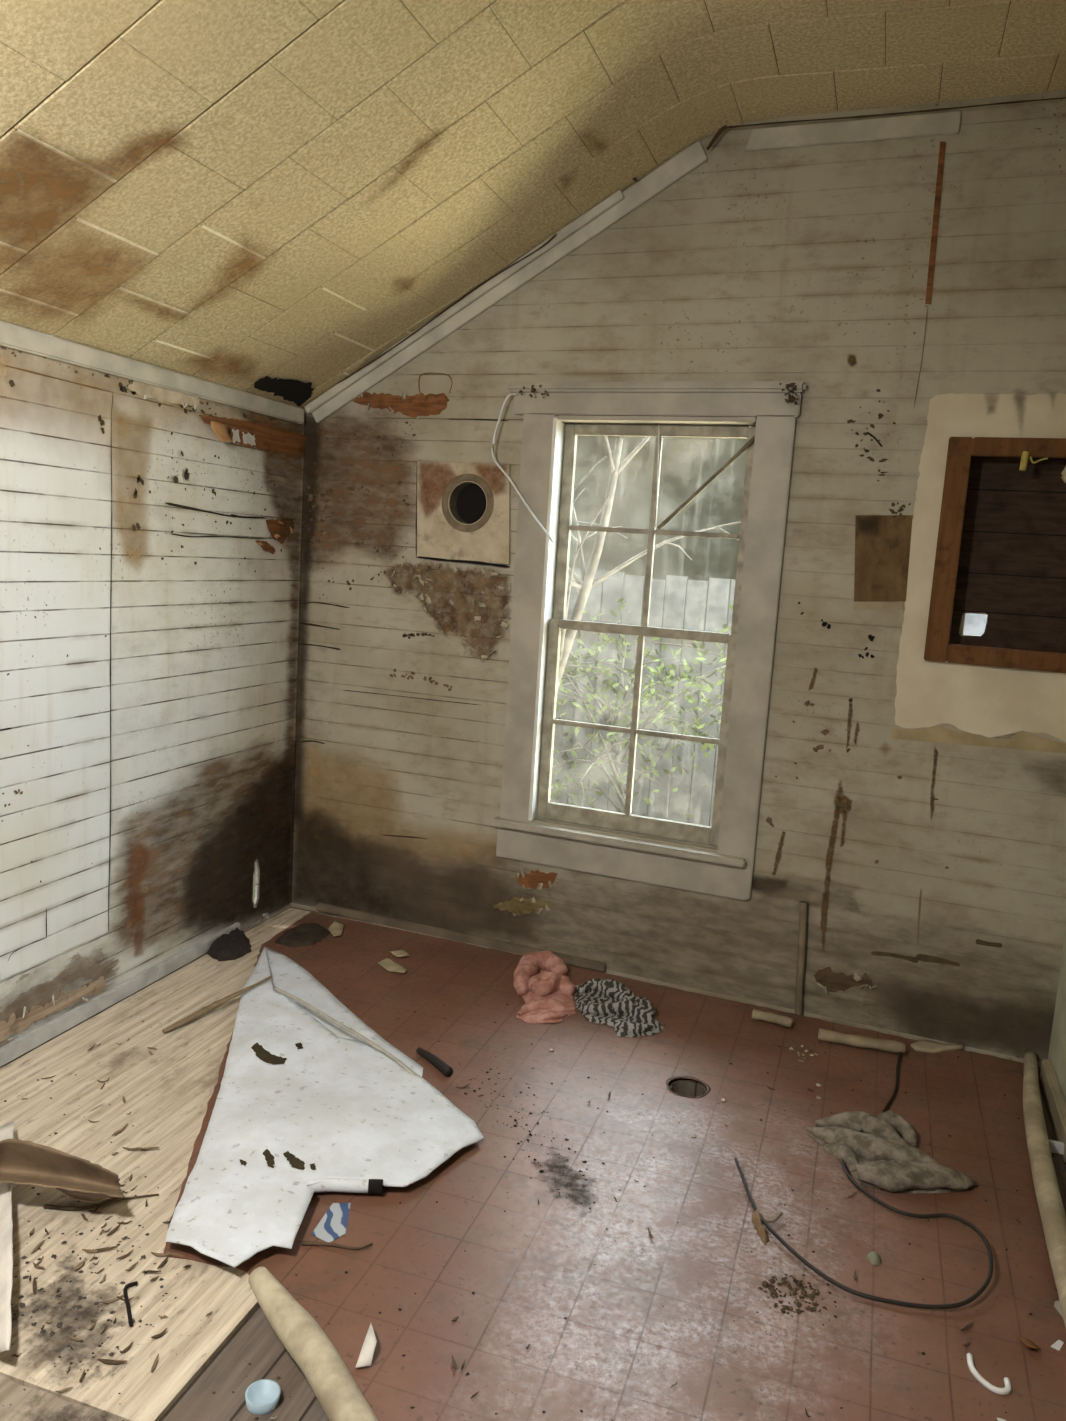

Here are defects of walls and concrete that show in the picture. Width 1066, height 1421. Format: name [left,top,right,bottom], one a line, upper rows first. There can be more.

water stain [0,132,178,261]
water stain [14,251,119,313]
peeling [43,357,356,565]
peeling [316,392,511,661]
water stain [115,409,529,945]
corrosion [821,783,852,947]
peeling [0,948,119,1047]